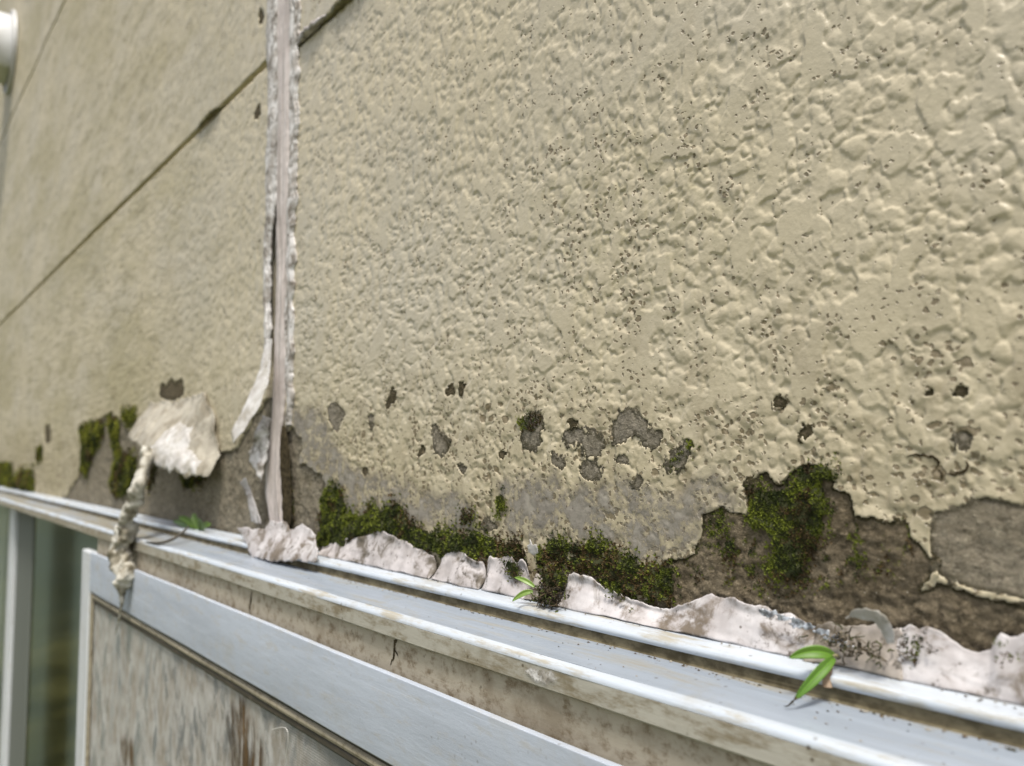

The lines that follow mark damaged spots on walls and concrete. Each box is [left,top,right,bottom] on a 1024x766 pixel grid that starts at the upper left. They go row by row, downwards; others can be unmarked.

peeling [327,400,346,432]
peeling [385,387,398,409]
peeling [445,381,467,396]
peeling [771,394,788,410]
peeling [952,382,969,398]
spalling [65,339,273,535]
peeling [417,424,452,458]
peeling [519,406,694,491]
peeling [795,423,815,444]
spalling [286,427,326,551]
damp [500,476,730,562]
spalling [648,465,1024,652]